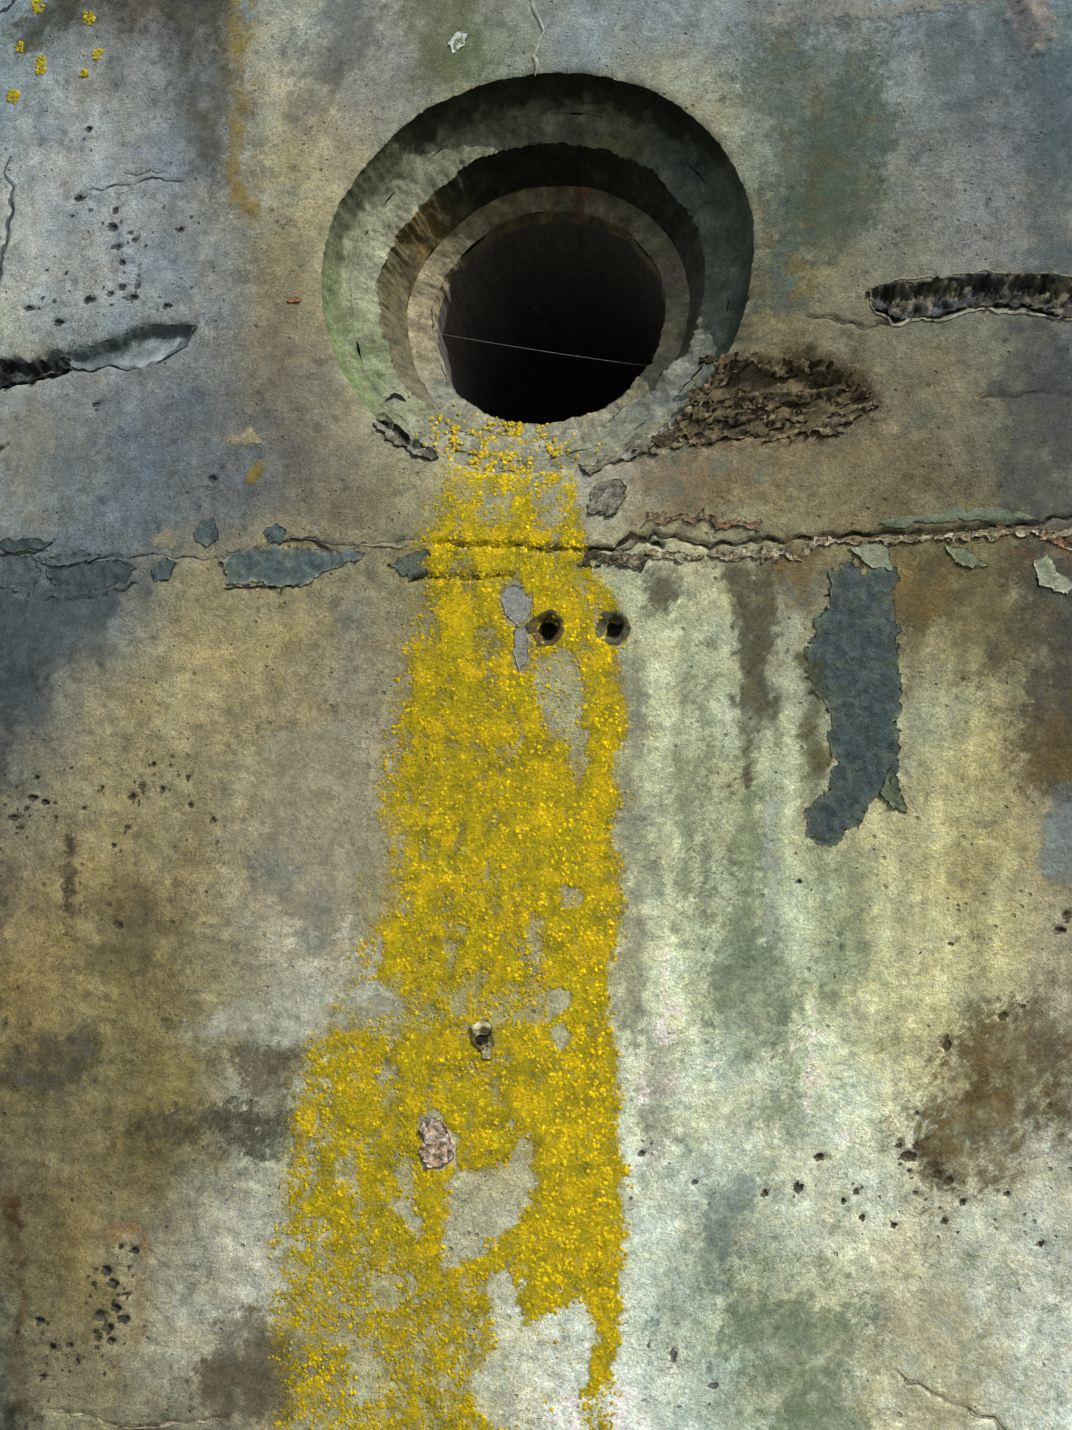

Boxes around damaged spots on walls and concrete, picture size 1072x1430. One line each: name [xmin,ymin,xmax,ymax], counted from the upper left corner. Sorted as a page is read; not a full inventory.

crack [0,155,14,279]
spalling [866,273,1072,322]
flaking render [0,303,197,390]
spalling [578,330,892,518]
crack [45,553,294,601]
peeling [194,505,366,592]
crack [266,536,417,550]
crack [578,507,1072,571]
peeling [1033,554,1072,595]
damp [0,579,123,810]
damp [56,834,77,913]
damp [0,1019,98,1092]